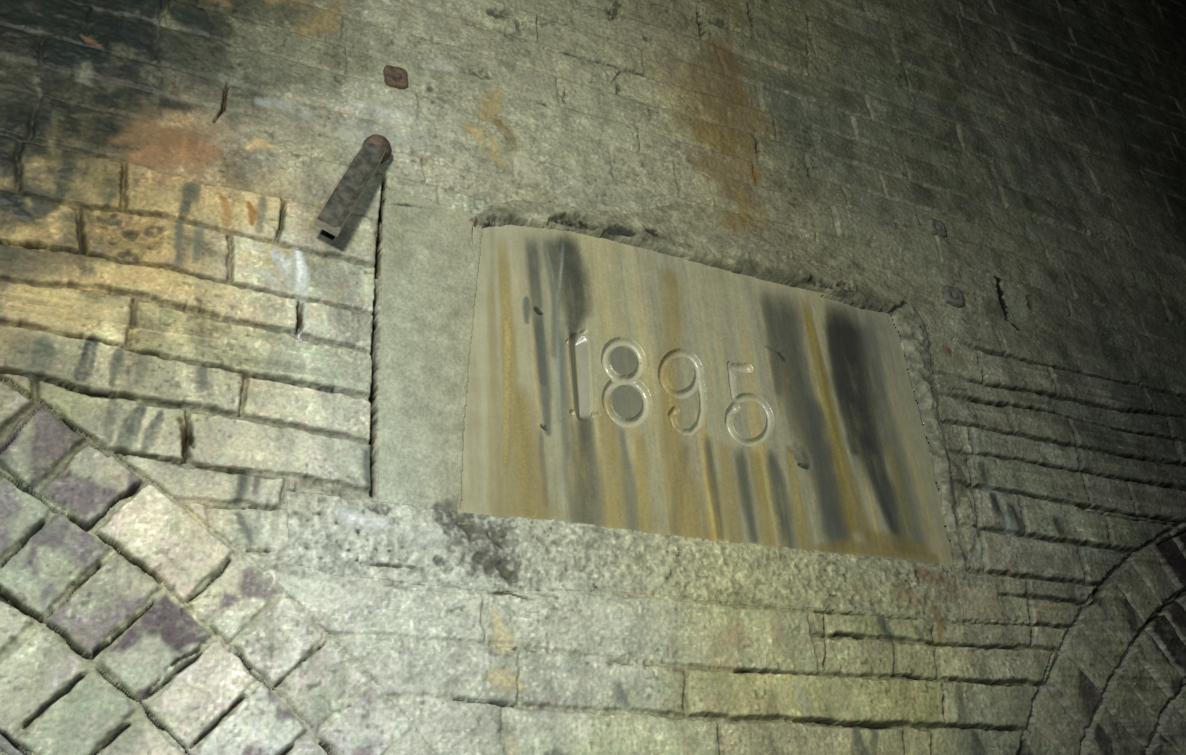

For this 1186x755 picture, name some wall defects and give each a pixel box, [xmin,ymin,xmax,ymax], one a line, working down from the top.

water stain [0,0,213,76]
corrosion [245,139,273,150]
water stain [0,193,42,223]
water stain [175,183,204,264]
crack [368,183,411,496]
water stain [524,240,585,434]
crack [994,276,1020,330]
water stain [765,302,842,544]
water stain [829,314,903,540]
water stain [706,443,720,517]
water stain [737,456,755,540]
spalling [434,502,519,585]